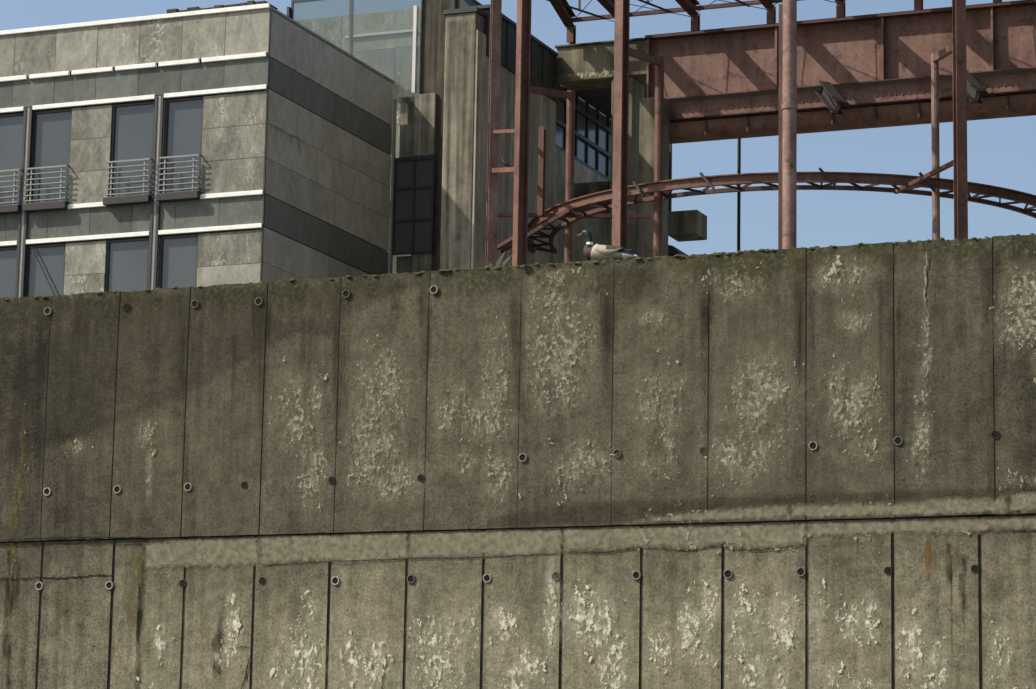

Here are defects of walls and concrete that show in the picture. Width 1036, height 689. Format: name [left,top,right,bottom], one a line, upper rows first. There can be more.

crack [968,526,1036,534]
crack [231,646,250,689]